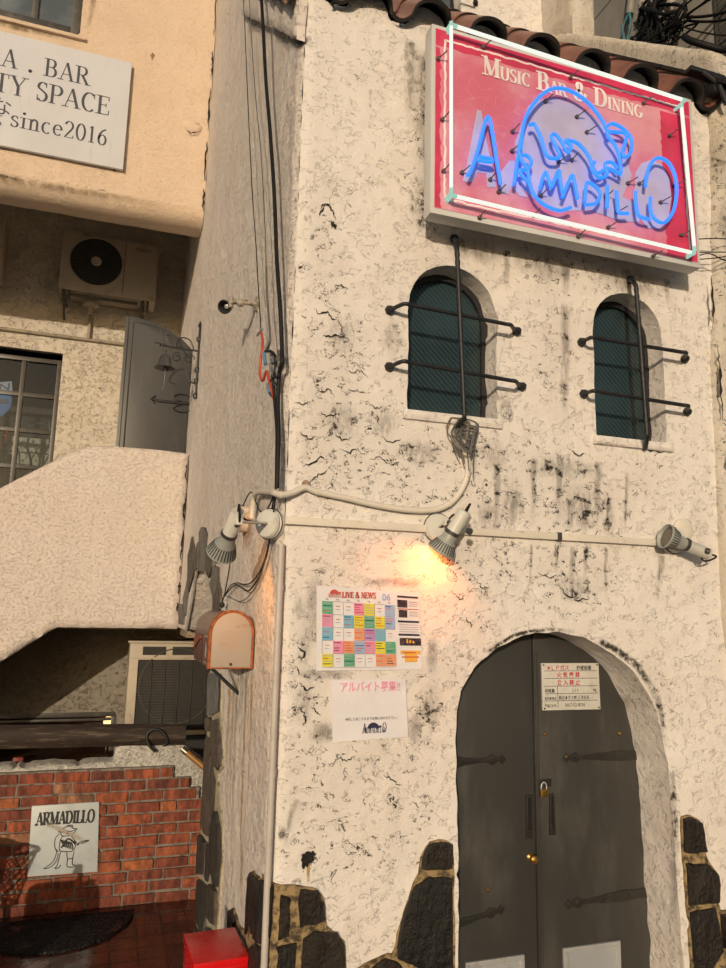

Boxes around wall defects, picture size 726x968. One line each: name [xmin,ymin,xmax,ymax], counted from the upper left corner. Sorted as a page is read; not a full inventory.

damp [557,489,610,524]